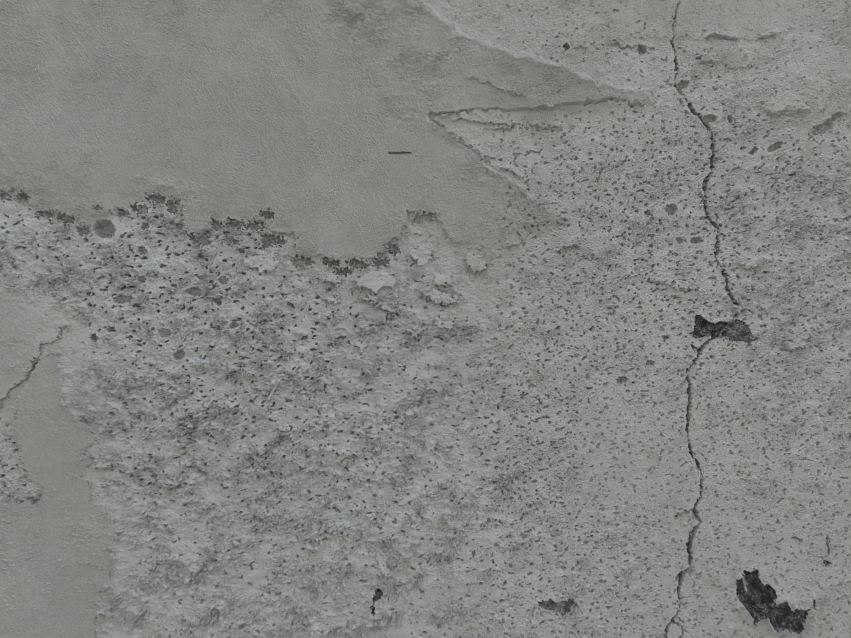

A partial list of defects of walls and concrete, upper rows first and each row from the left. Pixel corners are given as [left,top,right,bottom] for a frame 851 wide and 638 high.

crack [0,323,74,409]
spalling [0,186,493,381]
crack [663,0,744,638]
peeling [690,315,756,343]
peeling [367,588,383,619]
peeling [734,569,819,638]